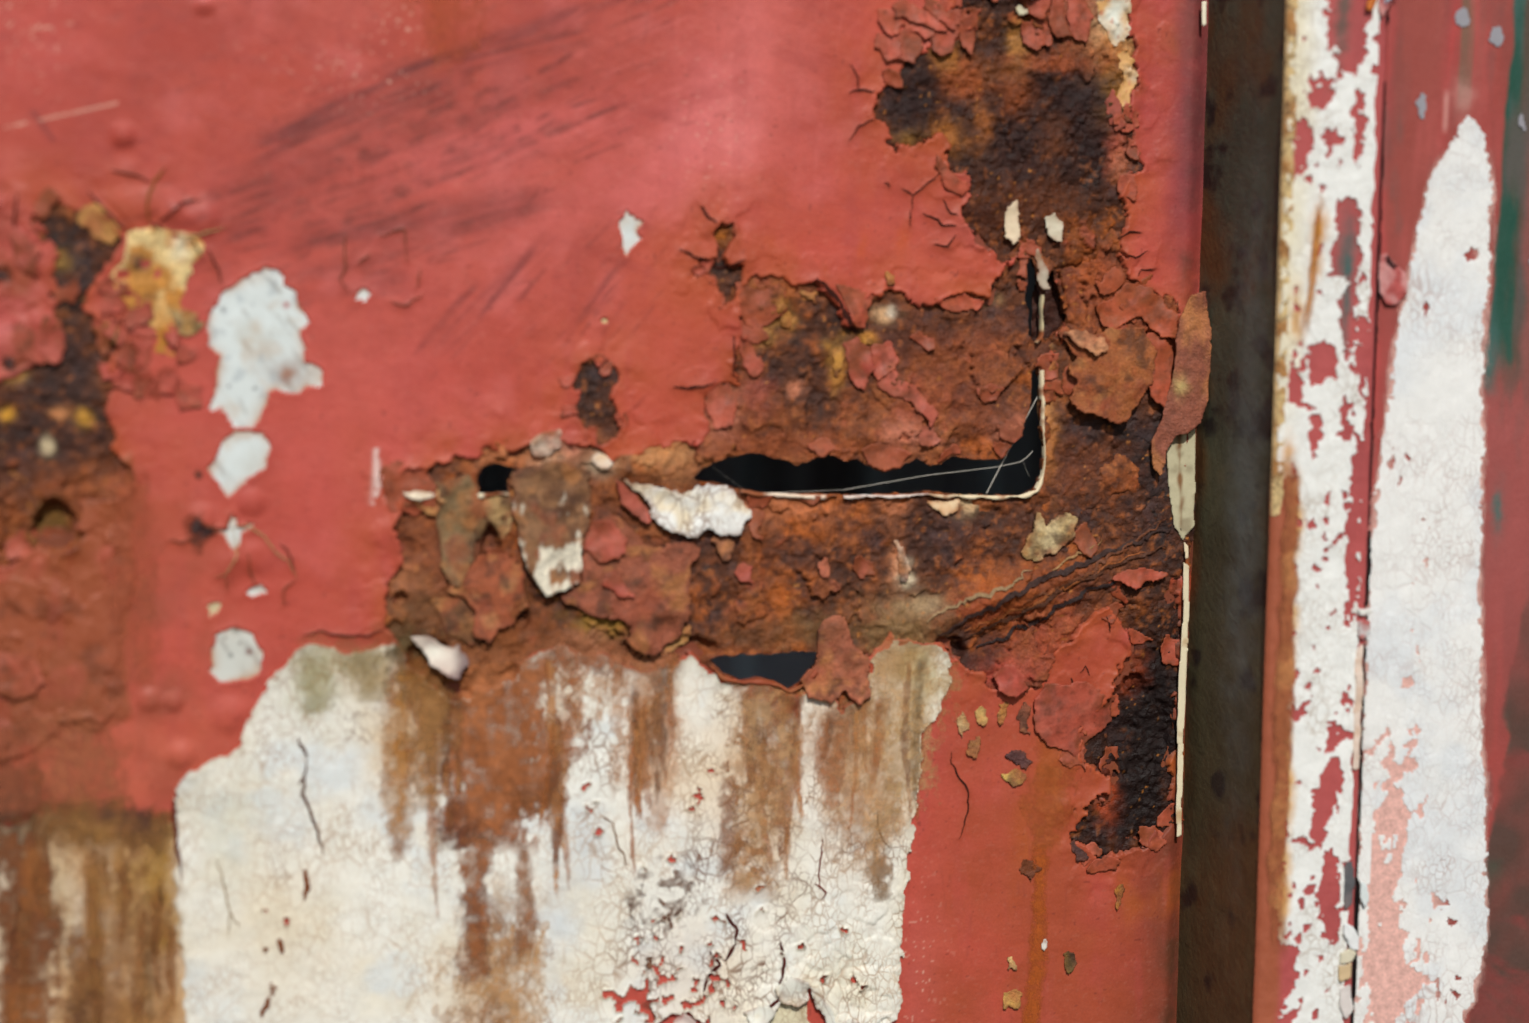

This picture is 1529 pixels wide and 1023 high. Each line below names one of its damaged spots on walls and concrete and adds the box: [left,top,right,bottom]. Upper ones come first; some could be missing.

corrosion [0,187,134,567]
peeling [77,203,322,549]
corrosion [189,517,215,547]
corrosion [379,0,1195,1023]
corrosion [0,652,45,701]
corrosion [0,793,174,1023]
crack [142,792,284,1018]
crack [298,737,324,901]
peeling [743,976,860,1023]